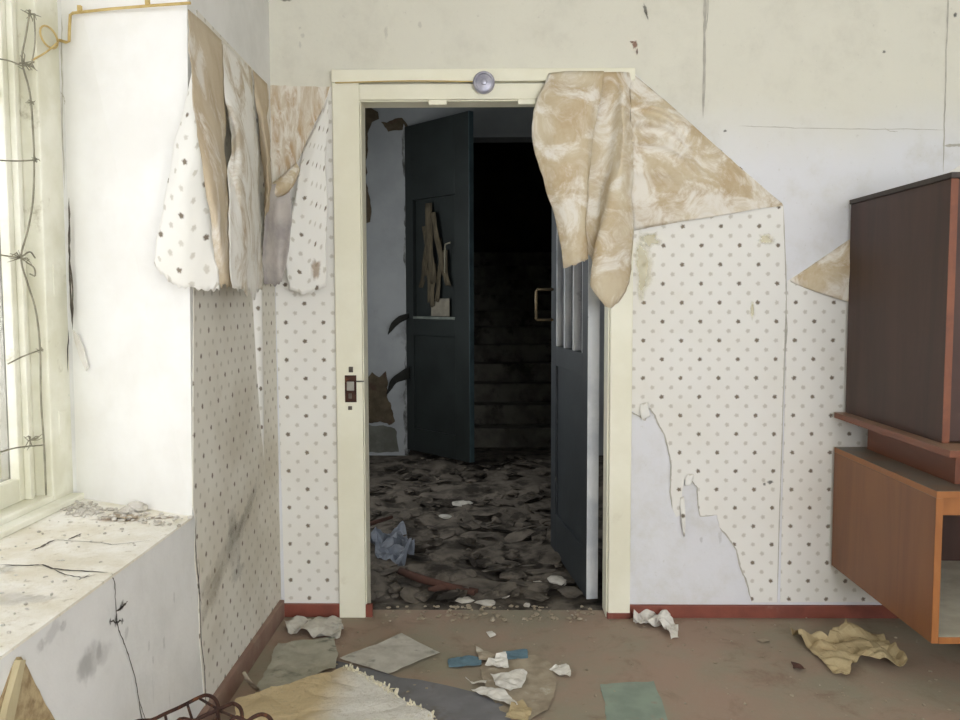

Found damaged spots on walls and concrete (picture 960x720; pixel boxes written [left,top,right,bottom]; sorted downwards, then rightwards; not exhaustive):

spalling [365,108,408,223]
spalling [368,326,409,455]
crack [1,533,145,719]